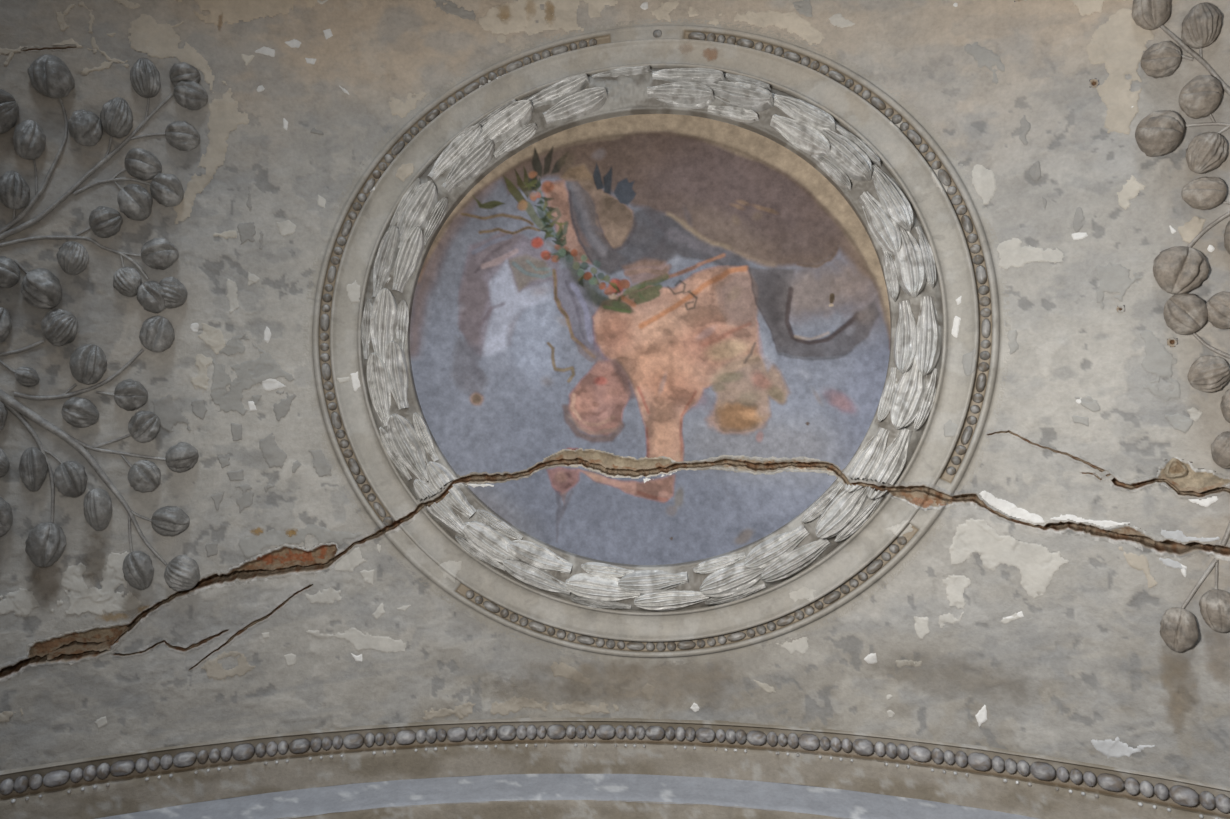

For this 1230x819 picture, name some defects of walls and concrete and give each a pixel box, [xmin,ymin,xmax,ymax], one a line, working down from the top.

peeling [1072,0,1155,134]
peeling [152,323,332,513]
crack [985,427,1230,500]
peeling [979,490,1220,542]
peeling [0,551,142,665]
spalling [225,542,374,585]
crack [0,454,1230,682]
peeling [914,518,1069,639]
peeling [1119,546,1187,588]
peeling [776,637,809,654]
peeling [864,653,877,664]
peeling [975,705,987,727]